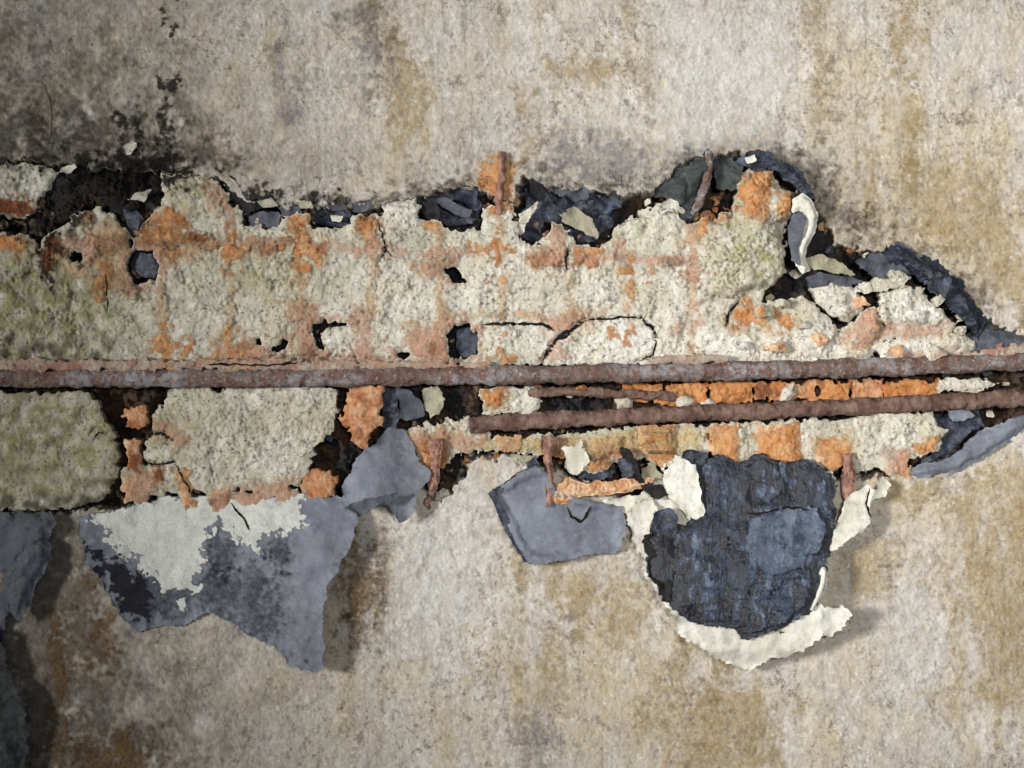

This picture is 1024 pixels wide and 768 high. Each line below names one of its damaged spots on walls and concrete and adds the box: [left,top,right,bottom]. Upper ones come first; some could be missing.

leakage [0,71,197,182]
leakage [239,180,286,204]
corrosion [0,155,799,371]
crack [483,316,657,361]
corrosion [474,385,510,409]
spalling [0,161,1024,768]
corrosion [407,425,740,473]
corrosion [752,421,854,471]